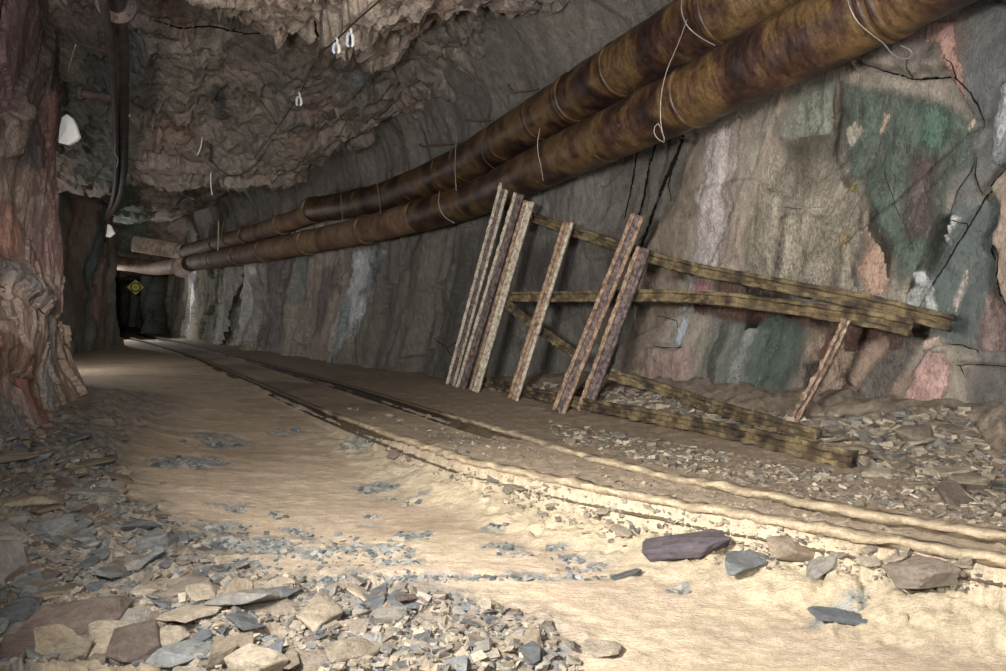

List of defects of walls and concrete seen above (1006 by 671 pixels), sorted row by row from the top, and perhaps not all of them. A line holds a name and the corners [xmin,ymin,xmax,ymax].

crack [858,57,985,127]
crack [624,135,685,247]
crack [919,158,1006,307]